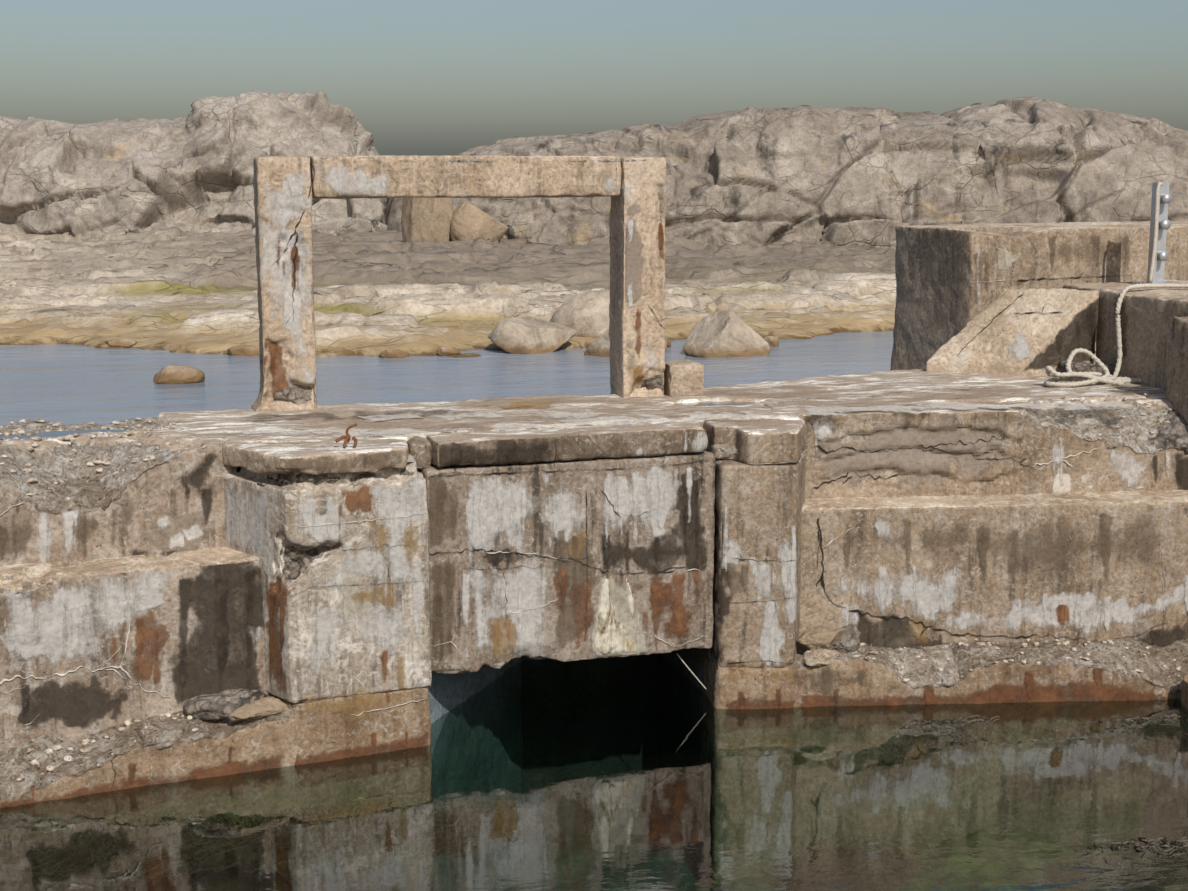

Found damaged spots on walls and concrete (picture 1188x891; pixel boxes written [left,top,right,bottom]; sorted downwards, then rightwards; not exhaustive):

crack [274,161,316,322]
rust [335,423,357,447]
crack [746,436,1101,488]
rust [337,486,385,551]
leakage [240,409,799,674]
rust [554,531,594,648]
rust [637,570,700,647]
crack [727,517,1167,642]
leakage [18,676,127,727]
rust [111,611,168,683]
spalling [431,655,537,672]
rust [727,664,1171,709]